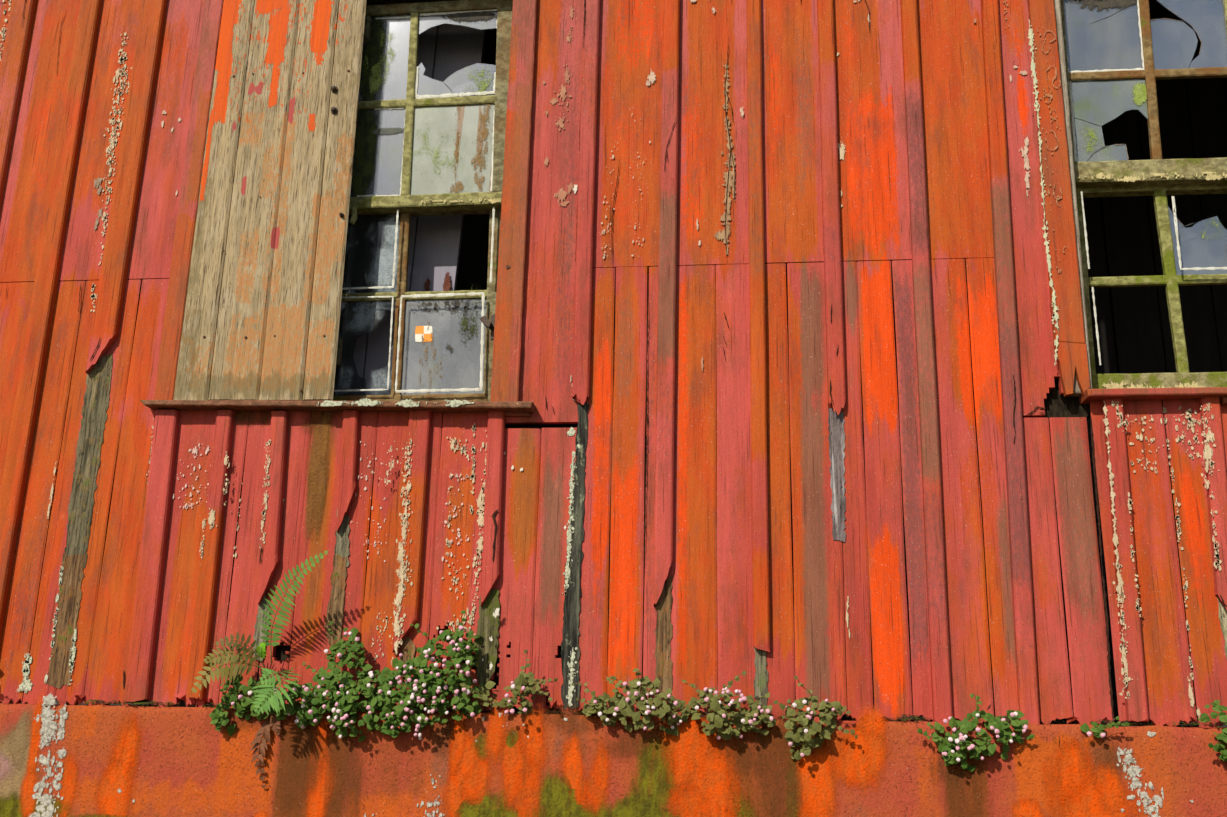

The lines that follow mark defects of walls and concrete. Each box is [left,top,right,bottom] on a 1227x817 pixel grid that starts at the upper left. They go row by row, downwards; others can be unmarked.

peeling [94,33,132,265]
crack [724,38,735,258]
peeling [1010,20,1059,365]
peeling [172,443,243,559]
peeling [259,439,284,548]
peeling [355,439,413,665]
peeling [436,423,487,635]
peeling [1102,380,1222,718]
damp [506,732,517,748]